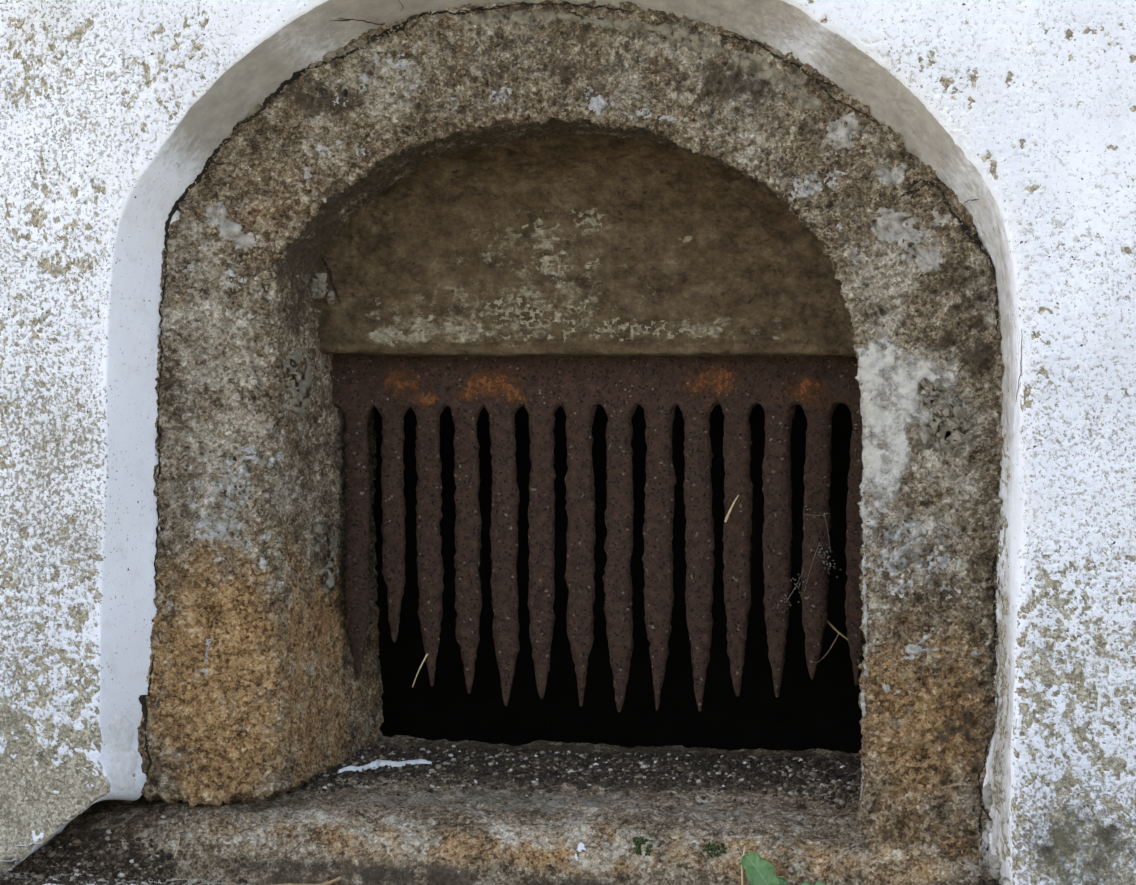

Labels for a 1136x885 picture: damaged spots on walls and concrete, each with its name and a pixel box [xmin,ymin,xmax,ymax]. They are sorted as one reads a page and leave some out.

peeling [0,7,94,109]
peeling [918,50,935,70]
peeling [1064,26,1136,63]
peeling [939,69,979,109]
peeling [981,150,998,180]
peeling [3,154,108,294]
peeling [932,209,951,227]
peeling [0,294,87,493]
rust [457,370,525,403]
peeling [979,420,1136,885]
leakage [1027,805,1132,885]